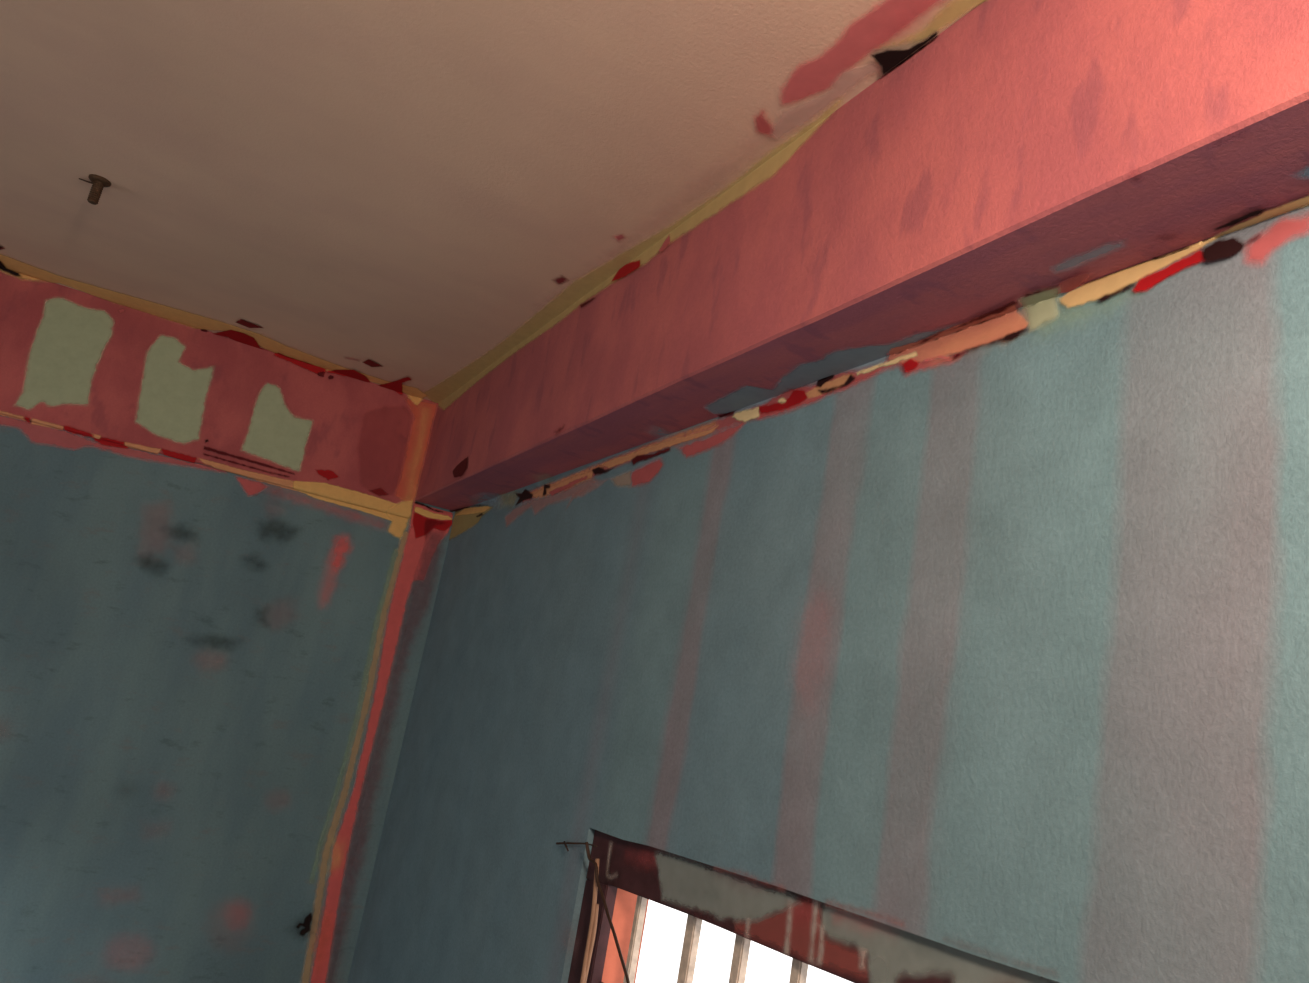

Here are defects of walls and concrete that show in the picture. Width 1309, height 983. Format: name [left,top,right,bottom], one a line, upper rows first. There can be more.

spalling [872,32,938,75]
peeling [516,197,1309,505]
peeling [0,411,492,580]